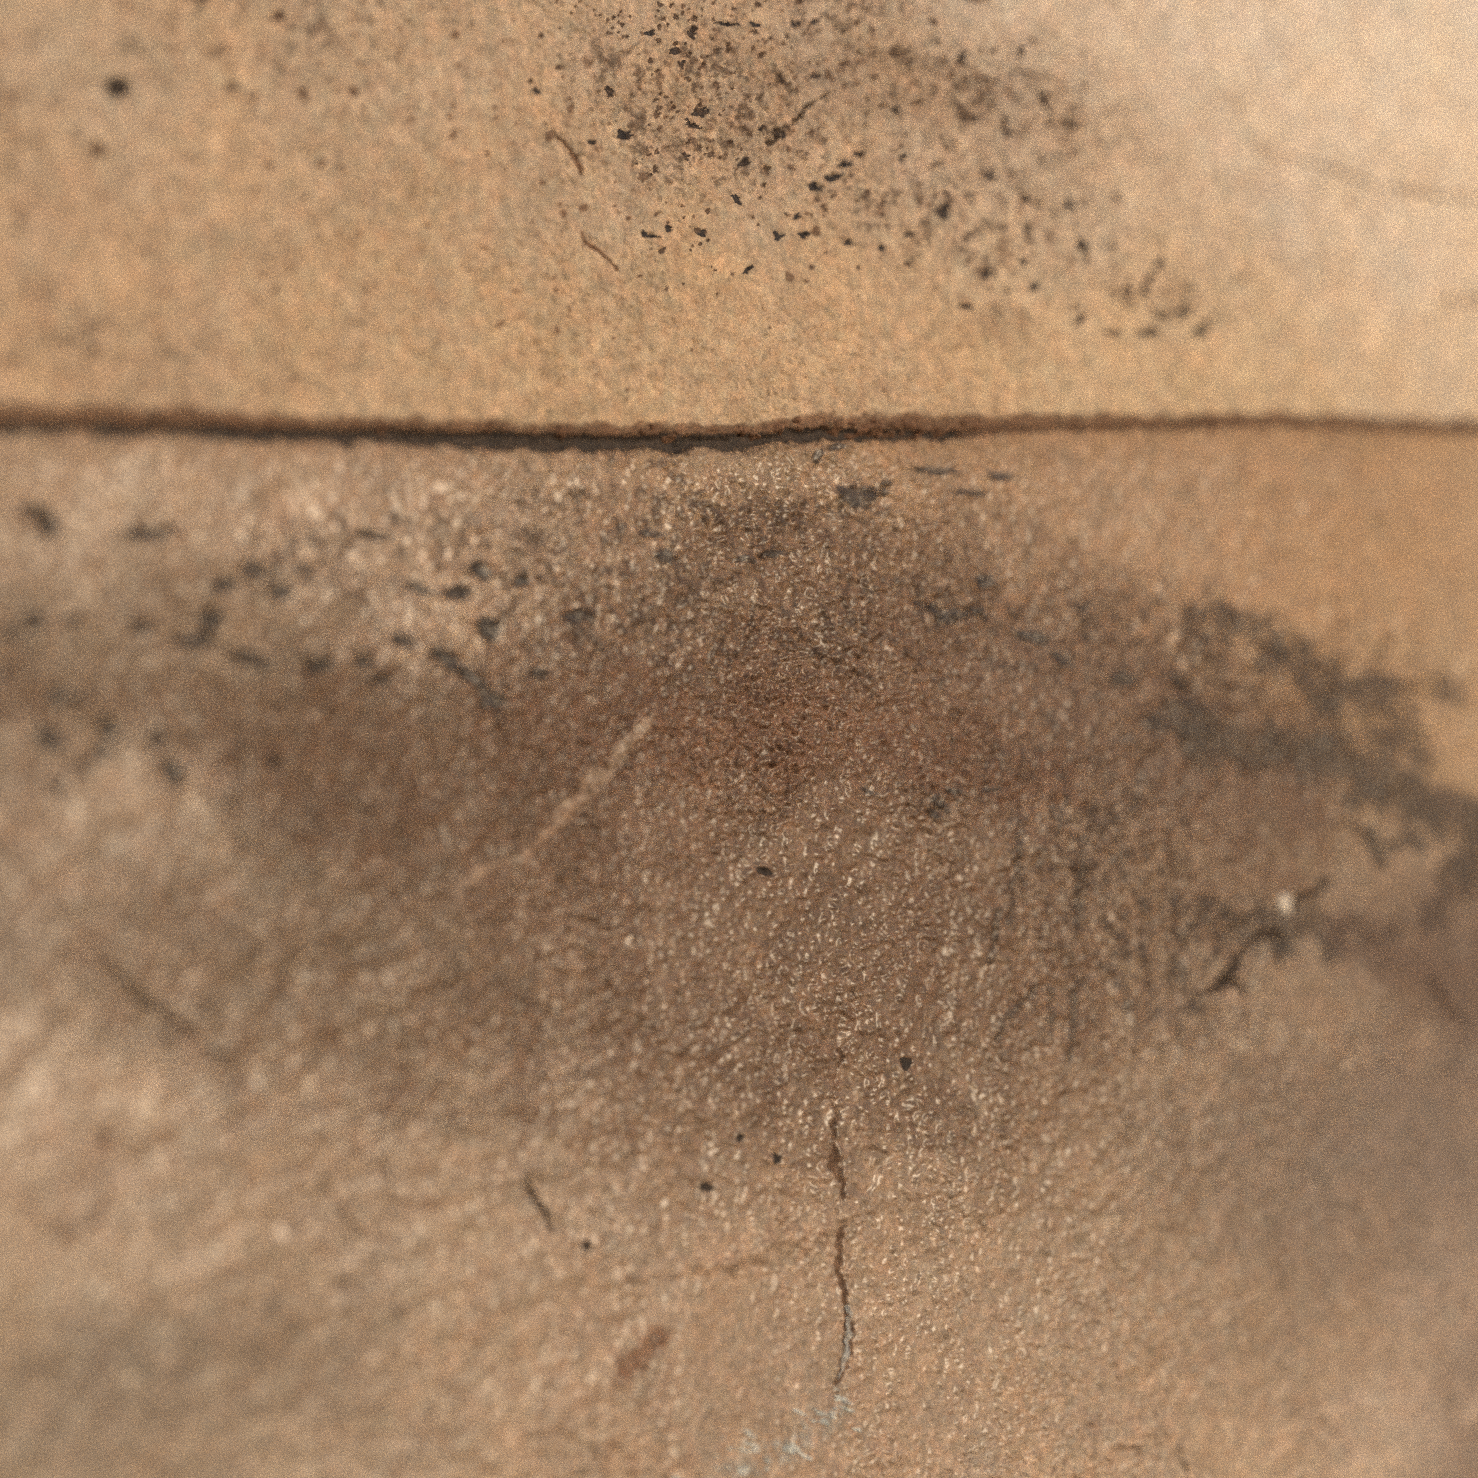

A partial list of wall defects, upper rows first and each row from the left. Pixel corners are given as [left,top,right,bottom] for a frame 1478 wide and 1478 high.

crack [0,403,1478,454]
damp [25,500,1478,1146]
crack [525,1165,554,1233]
crack [828,1049,855,1385]